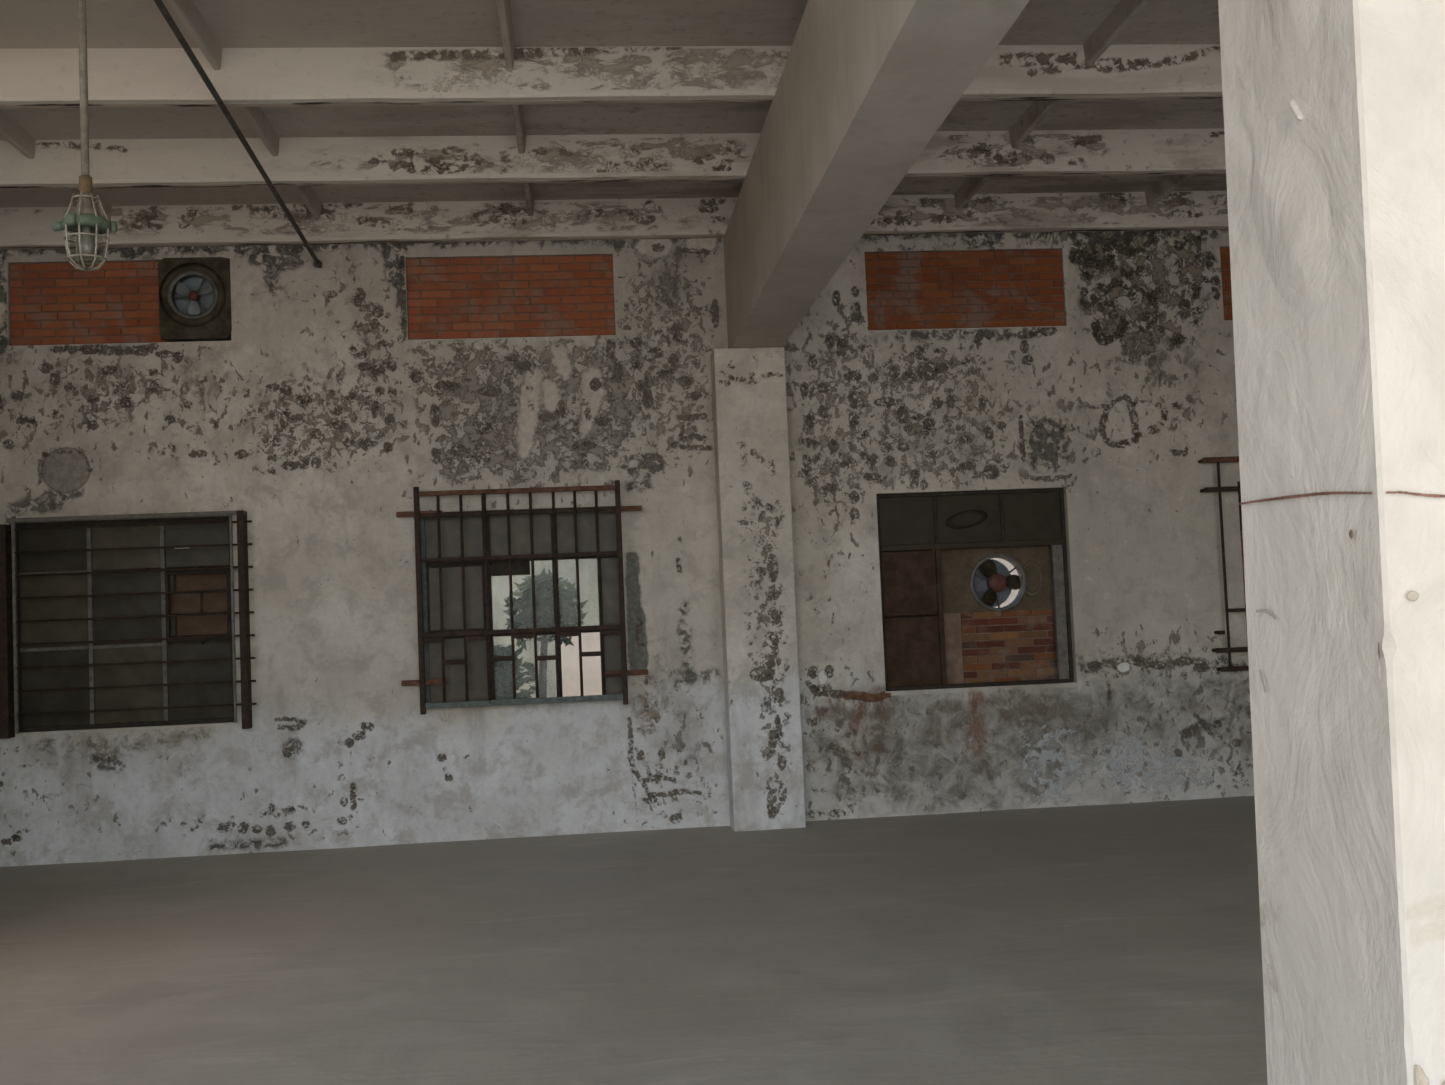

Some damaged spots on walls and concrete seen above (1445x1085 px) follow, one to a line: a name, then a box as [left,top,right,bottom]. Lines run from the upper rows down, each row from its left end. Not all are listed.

peeling [385,47,786,92]
peeling [361,138,746,175]
peeling [939,134,1107,167]
peeling [871,192,1228,227]
peeling [0,343,207,458]
peeling [739,482,824,819]
peeling [806,665,865,698]
peeling [1080,648,1247,678]
flaking render [275,717,307,758]
peeling [1174,713,1249,789]
peeling [1,830,30,845]
peeling [161,803,310,850]